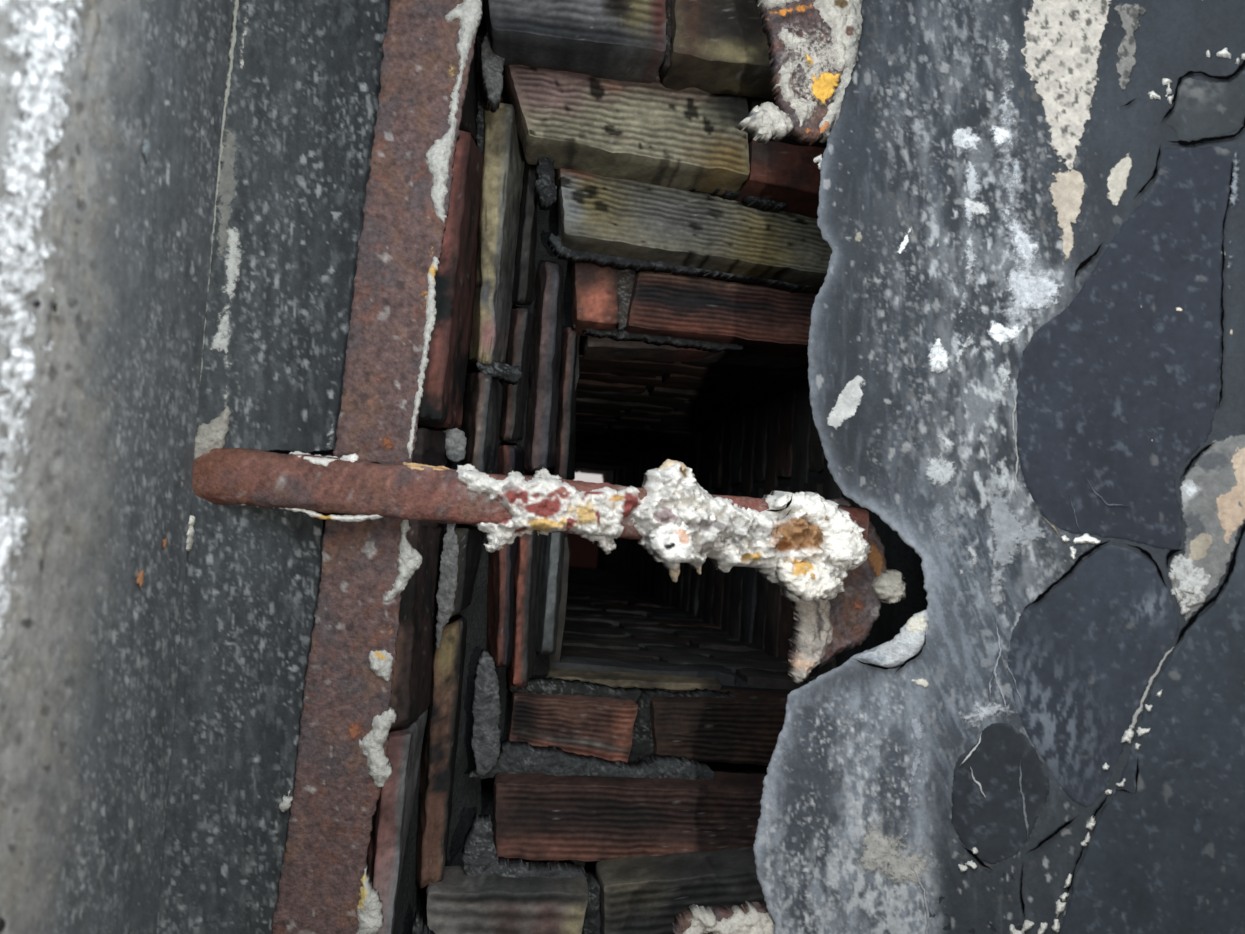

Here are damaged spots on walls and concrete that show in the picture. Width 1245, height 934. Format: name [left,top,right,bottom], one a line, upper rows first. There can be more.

rust [768,5,812,20]
rust [806,53,839,104]
flaking render [1021,0,1146,261]
crack [1134,60,1245,405]
leakage [0,0,95,637]
flaking render [827,376,865,430]
rust [867,540,883,576]
spalling [856,609,929,667]
flaking render [951,69,1245,934]
crack [1023,541,1181,611]
crack [1175,525,1245,646]
crack [962,761,1139,921]